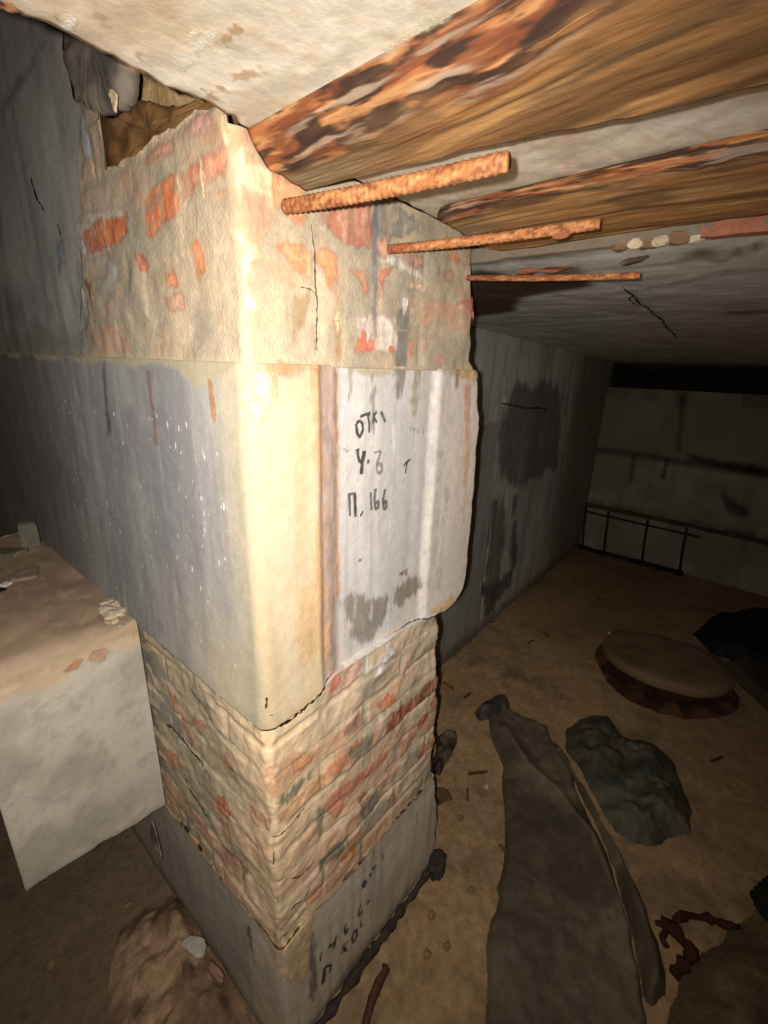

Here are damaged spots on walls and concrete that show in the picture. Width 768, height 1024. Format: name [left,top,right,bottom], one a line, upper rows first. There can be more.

peeling [108,89,118,113]
spalling [77,112,641,298]
peeling [164,271,185,312]
peeling [277,243,340,332]
crack [301,228,319,352]
crack [621,286,677,339]
water stain [346,371,458,678]
water stain [482,534,517,614]
crack [397,612,444,631]
crack [261,668,338,731]